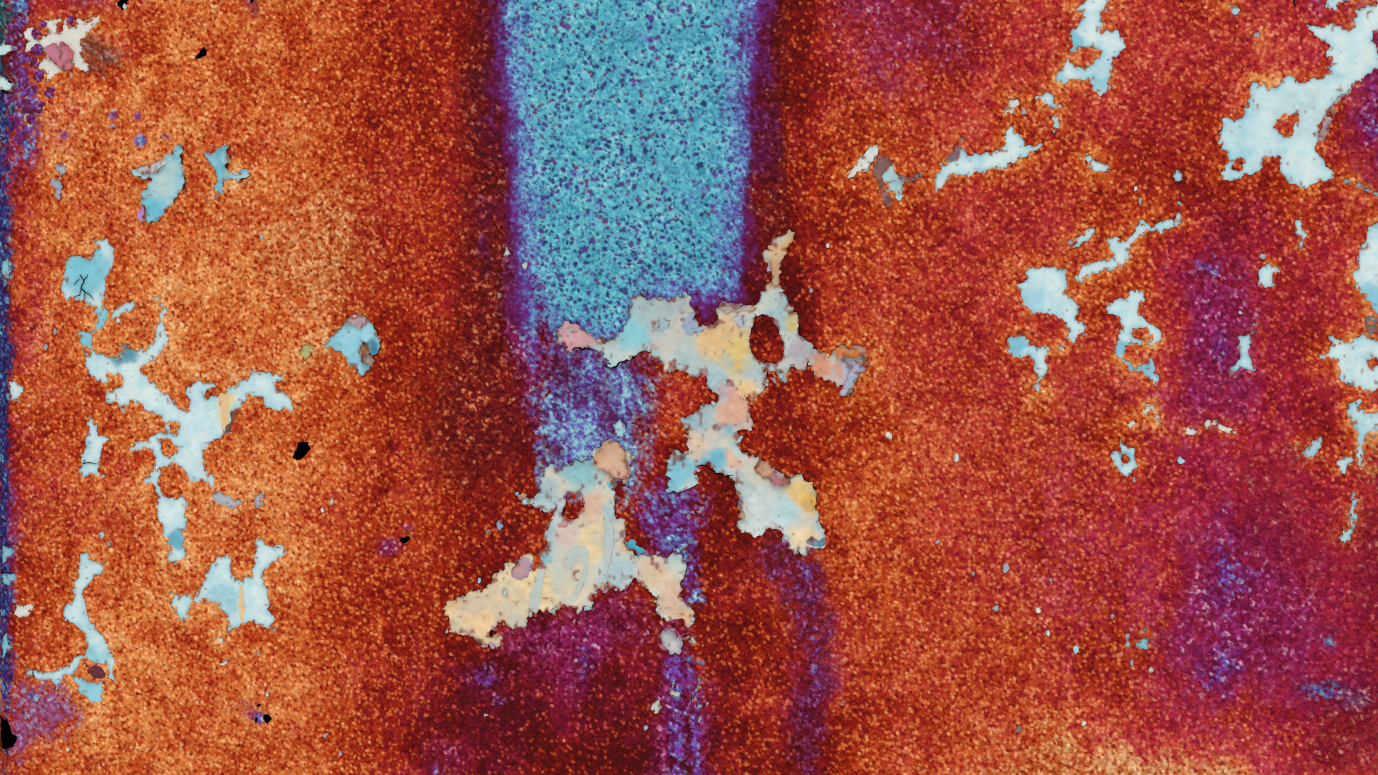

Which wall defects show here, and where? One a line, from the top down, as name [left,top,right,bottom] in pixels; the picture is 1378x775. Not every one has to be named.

corrosion [79,34,120,77]
peeling [61,238,293,565]
corrosion [258,180,386,353]
corrosion [412,0,536,488]
peeling [553,229,870,556]
corrosion [756,2,788,278]
peeling [847,0,1126,208]
peeling [1007,201,1183,391]
peeling [1218,0,1378,195]
peeling [442,419,697,655]
corrosion [1315,456,1378,770]
corrosion [983,733,1245,775]